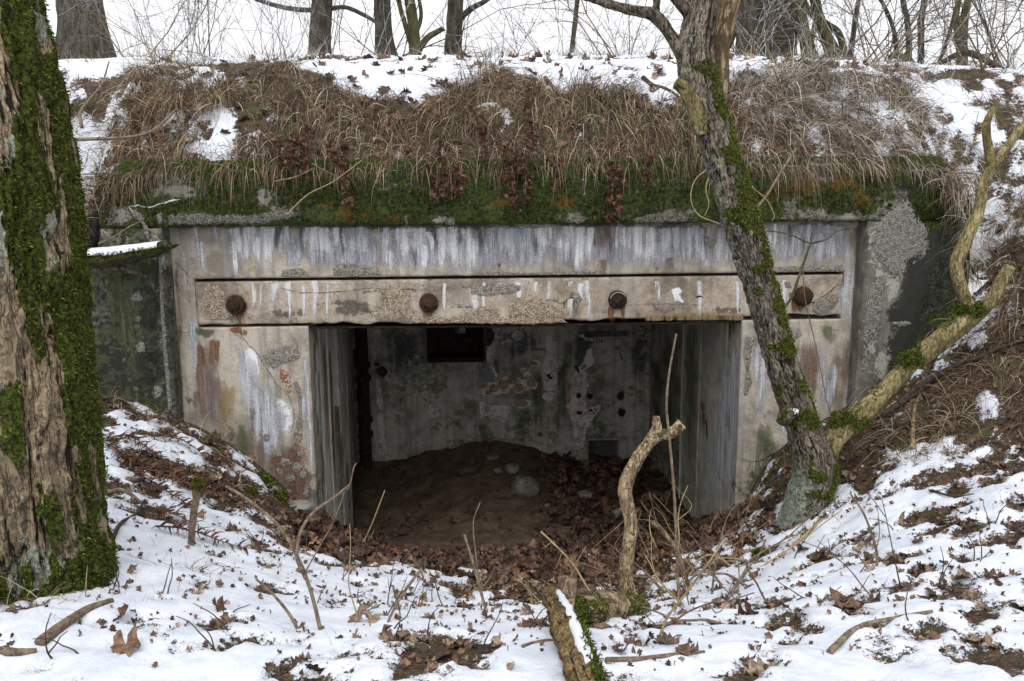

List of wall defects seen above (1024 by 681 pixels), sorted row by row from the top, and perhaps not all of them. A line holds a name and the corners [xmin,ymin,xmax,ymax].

damp [108,274,164,399]
damp [189,312,198,376]
corrosion [196,340,220,421]
corrosion [226,294,247,335]
damp [207,344,360,516]
damp [194,226,732,272]
peeling [565,334,624,451]
peeling [617,385,643,417]
damp [764,223,855,318]
spalling [861,198,930,376]